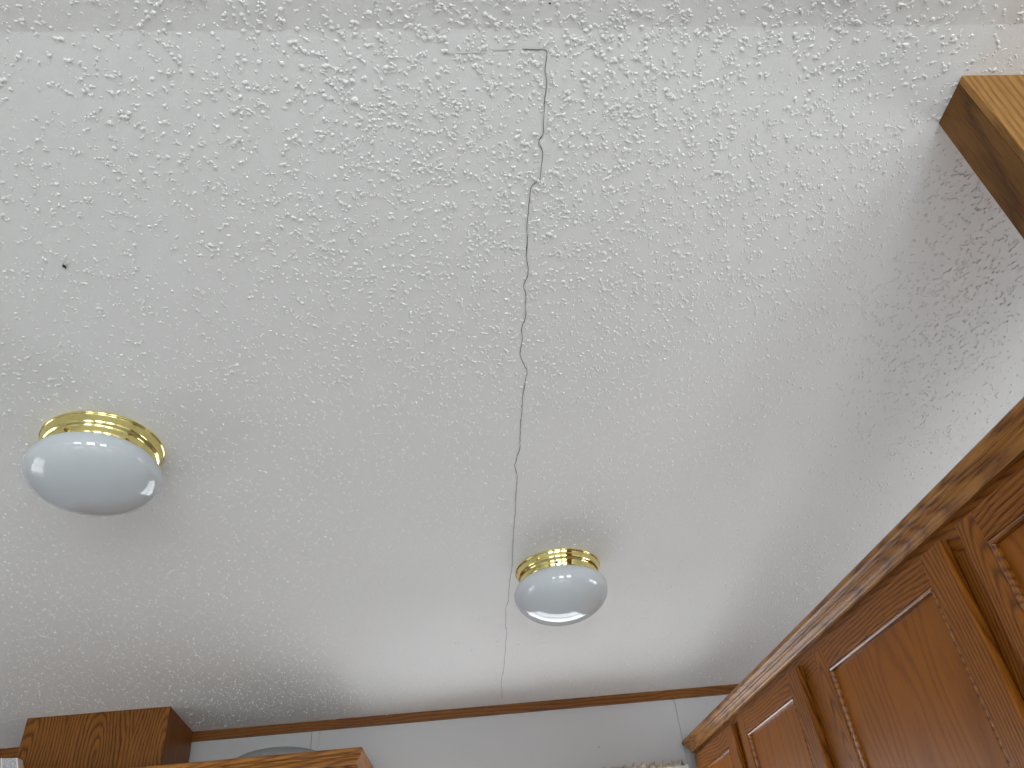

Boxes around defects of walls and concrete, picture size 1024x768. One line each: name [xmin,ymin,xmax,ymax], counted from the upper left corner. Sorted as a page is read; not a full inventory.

crack [444,49,547,688]